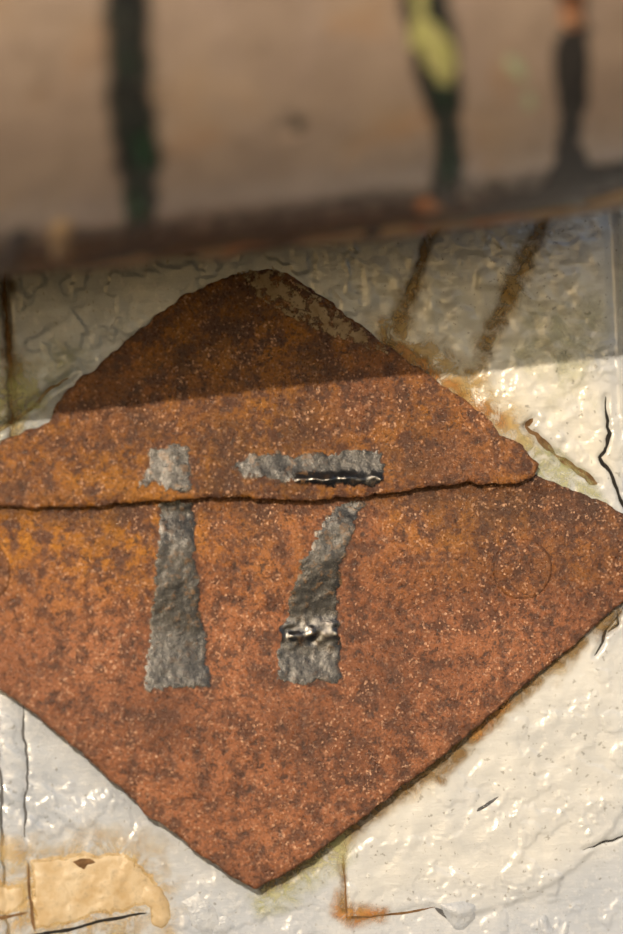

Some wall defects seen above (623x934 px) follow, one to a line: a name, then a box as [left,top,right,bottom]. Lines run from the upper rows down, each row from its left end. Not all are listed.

crack [0,277,68,432]
corrosion [378,220,548,451]
crack [525,397,623,507]
crack [2,914,10,934]
crack [0,706,29,886]
corrosion [0,845,70,929]
corrosion [260,636,587,925]
crack [583,835,623,850]